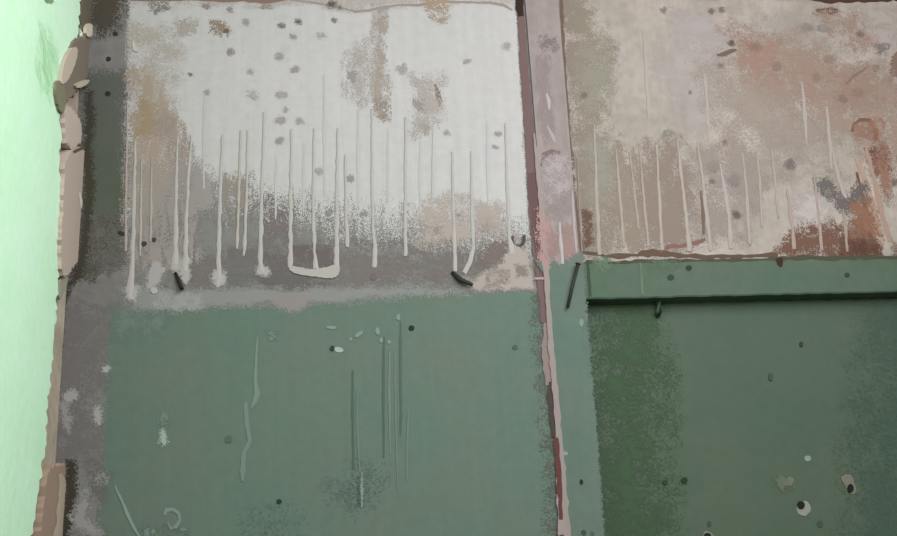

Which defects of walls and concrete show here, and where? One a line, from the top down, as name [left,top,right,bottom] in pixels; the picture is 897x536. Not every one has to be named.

water stain [126,0,439,25]
water stain [857,30,891,56]
spalling [846,51,897,85]
water stain [274,91,305,125]
water stain [73,19,259,284]
water stain [534,0,770,270]
water stain [812,175,871,214]
water stain [164,227,510,300]
spalling [513,263,529,279]
flaking render [31,463,65,536]